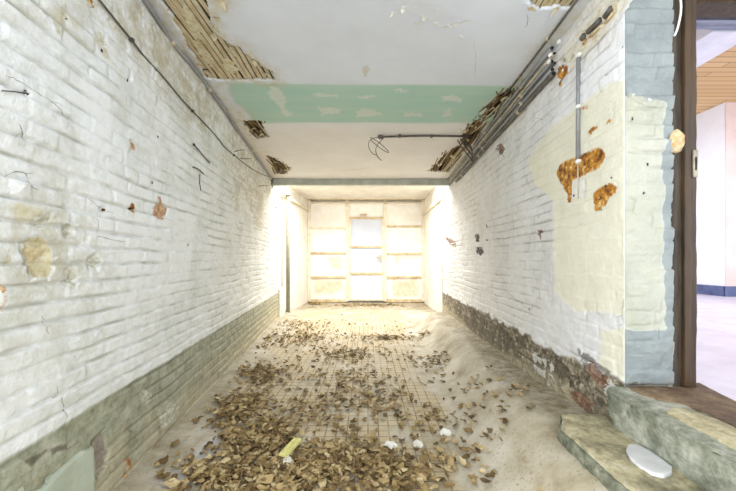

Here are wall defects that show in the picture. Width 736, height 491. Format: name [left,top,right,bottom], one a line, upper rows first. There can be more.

flaking render [165,0,274,80]
corrosion [556,62,570,87]
flaking render [238,120,269,139]
flaking render [427,87,518,172]
flaking render [266,155,292,174]
corrosion [555,144,608,203]
corrosion [591,181,619,211]
spalling [19,211,104,291]
leakage [451,294,572,388]
spalling [586,361,608,388]
leakage [574,343,670,399]